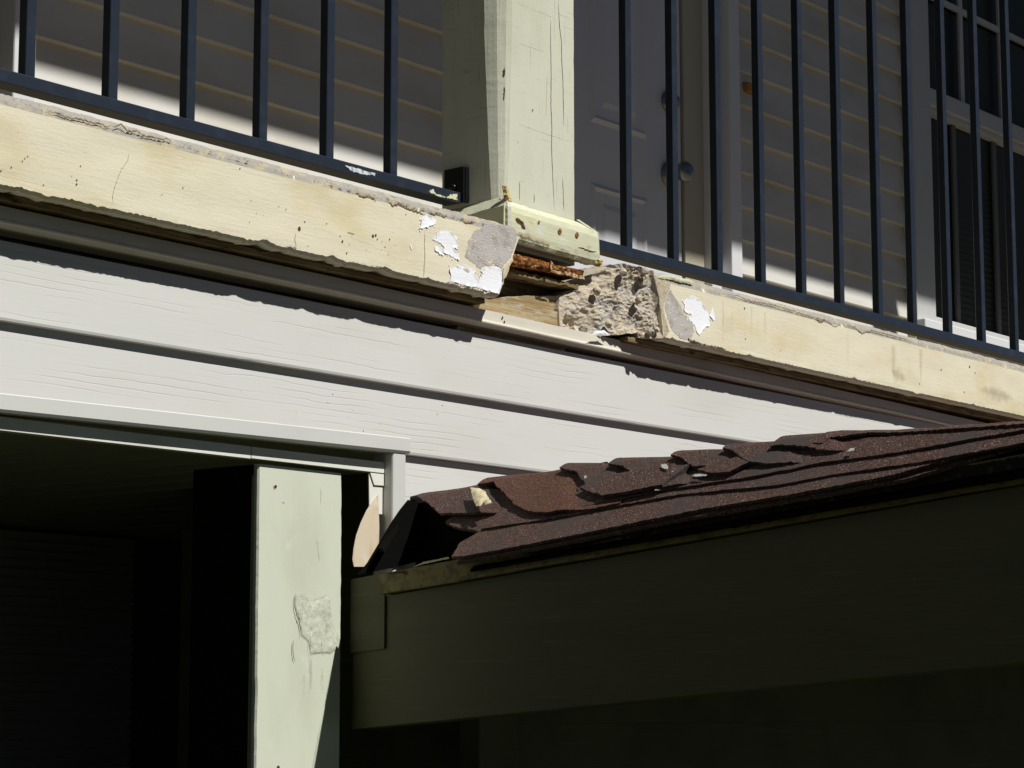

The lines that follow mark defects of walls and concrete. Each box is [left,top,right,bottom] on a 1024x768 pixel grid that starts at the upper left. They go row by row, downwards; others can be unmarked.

crack [51,112,171,195]
peeling [465,218,575,280]
corrosion [550,261,585,280]
spalling [547,263,697,340]